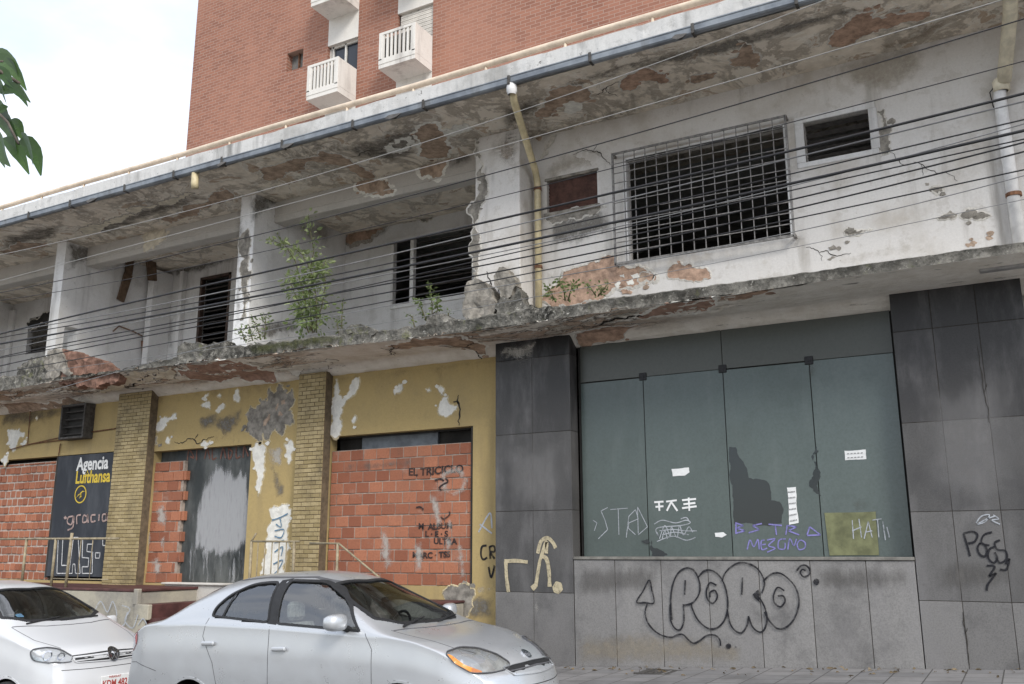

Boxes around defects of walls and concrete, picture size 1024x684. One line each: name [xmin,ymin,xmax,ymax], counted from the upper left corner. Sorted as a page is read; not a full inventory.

peeling [826,4,932,48]
peeling [618,67,670,92]
spalling [877,108,896,156]
peeling [251,150,397,198]
peeling [383,121,490,279]
peeling [237,228,253,321]
spalling [542,252,712,307]
spalling [100,358,361,497]